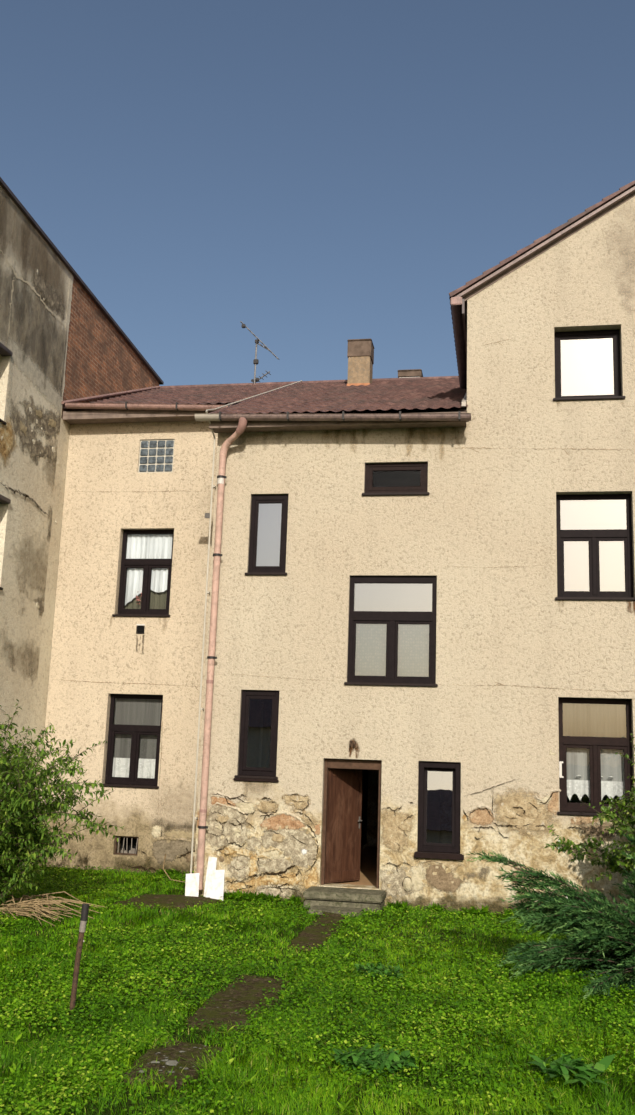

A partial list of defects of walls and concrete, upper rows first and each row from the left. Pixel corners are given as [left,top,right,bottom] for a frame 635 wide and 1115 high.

damp [0,192,65,414]
spalling [0,397,61,465]
spalling [151,792,321,898]
spalling [380,801,465,898]
spalling [462,788,561,836]
spalling [568,816,620,838]